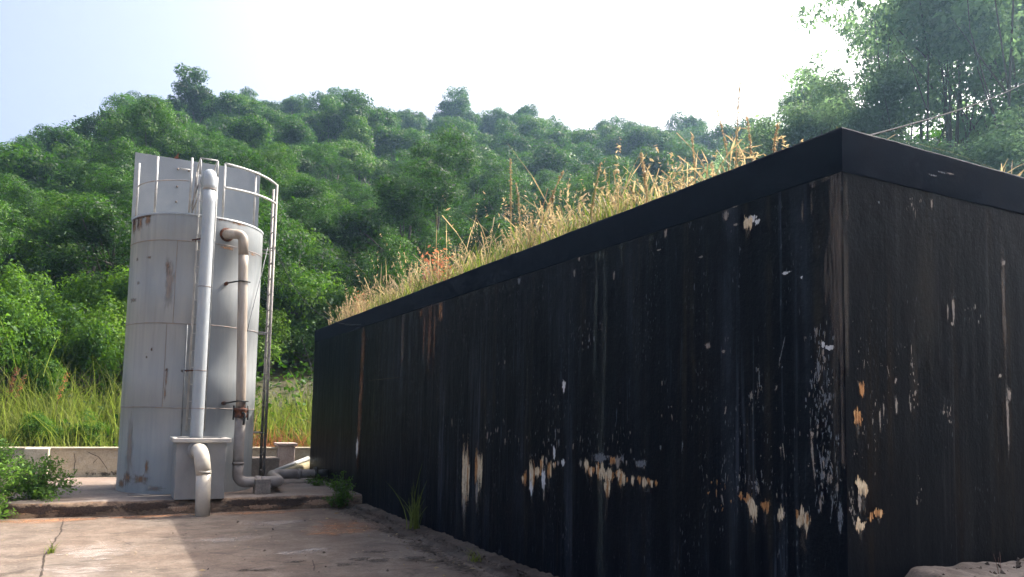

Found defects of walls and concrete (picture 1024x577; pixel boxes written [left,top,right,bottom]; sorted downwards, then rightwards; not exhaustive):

rust [133,215,151,232]
peeling [723,206,760,235]
damp [802,178,842,446]
rust [356,327,365,465]
peeling [703,256,918,547]
rust [119,430,158,490]
peeling [459,418,564,527]
peeling [573,429,658,508]